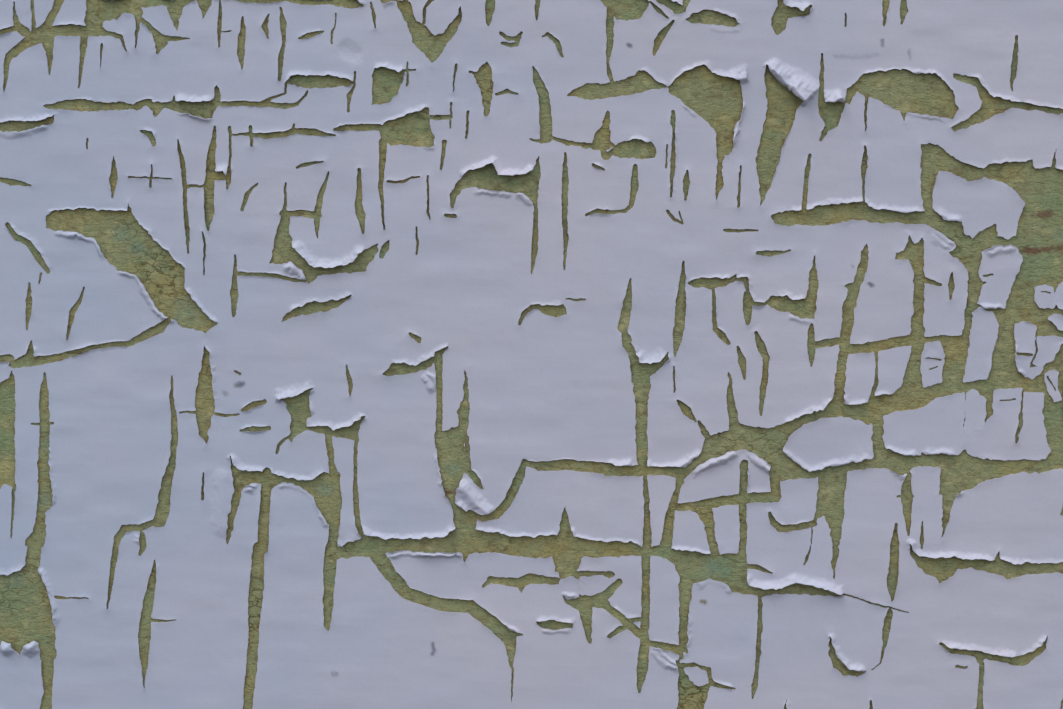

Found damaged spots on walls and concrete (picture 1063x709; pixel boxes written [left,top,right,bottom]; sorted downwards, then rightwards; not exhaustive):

peeling [46,157,218,340]
peeling [84,0,190,54]
peeling [261,71,453,284]
peeling [371,61,416,105]
peeling [334,0,462,63]
peeling [469,62,518,117]
peeling [530,66,656,170]
peeling [567,0,748,200]
peeling [771,0,812,35]
peeling [755,53,959,206]
peeling [179,143,1063,709]
peeling [0,371,89,709]